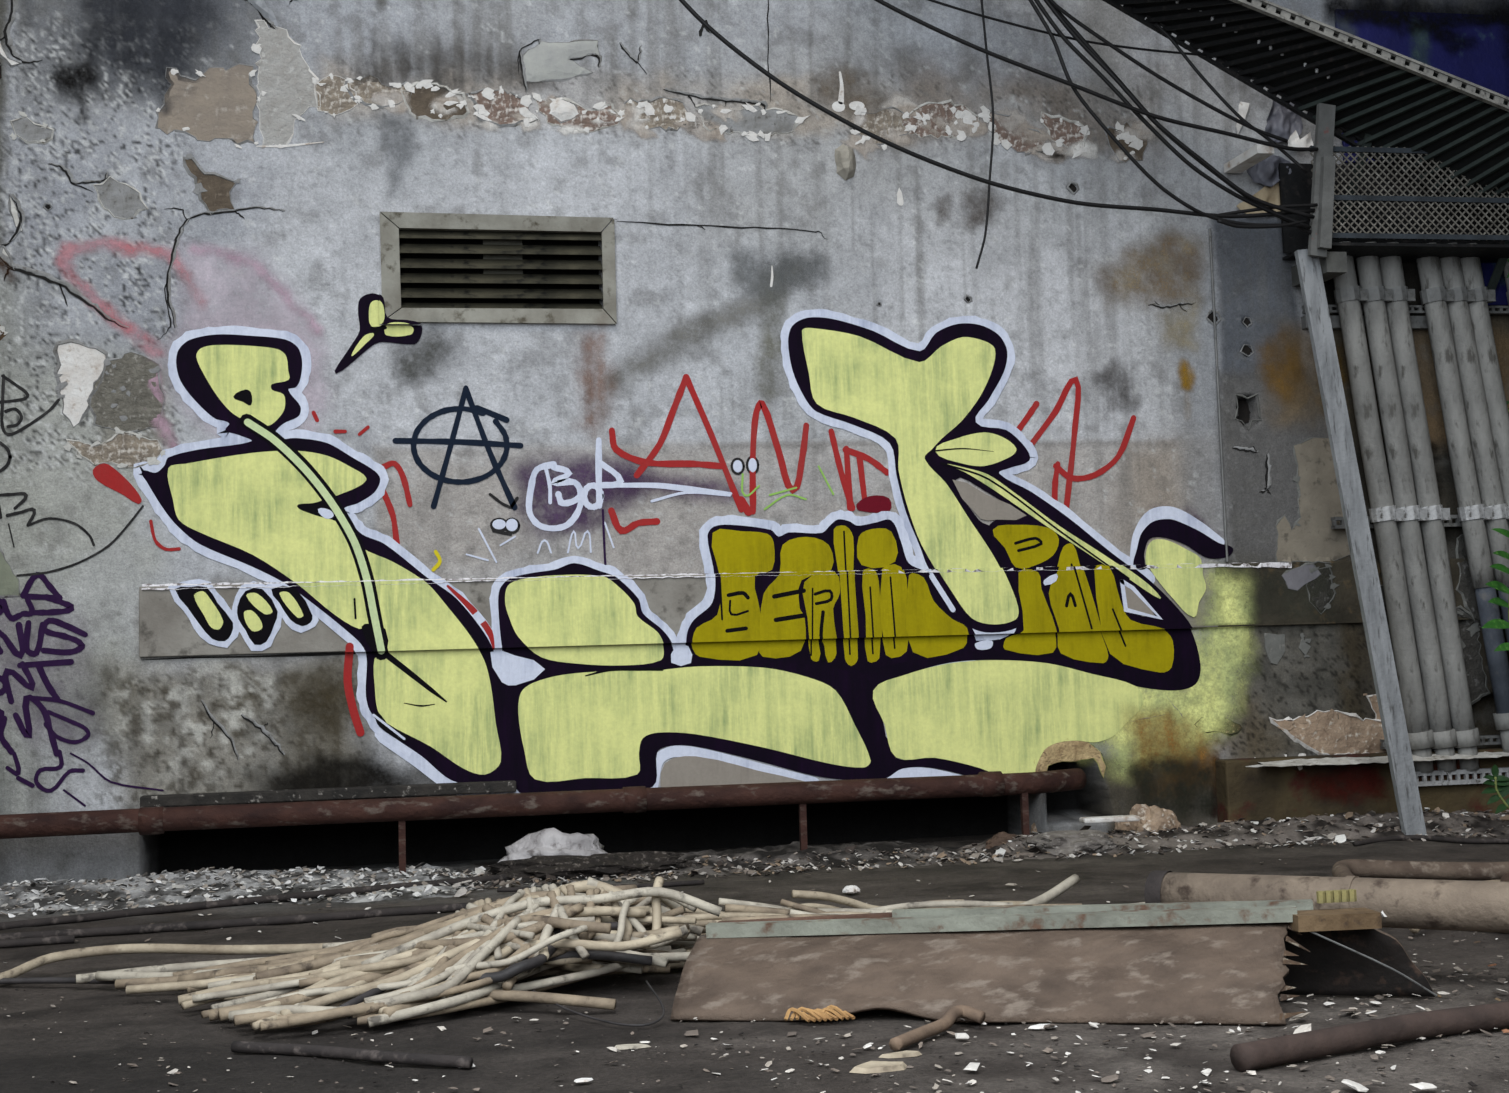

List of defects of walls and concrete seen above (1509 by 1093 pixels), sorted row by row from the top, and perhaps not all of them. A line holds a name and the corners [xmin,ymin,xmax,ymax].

crack [0,0,42,64]
crack [246,0,293,29]
spalling [155,20,810,216]
crack [49,163,109,192]
spalling [1066,181,1080,195]
crack [0,193,286,340]
peeling [1264,633,1311,665]
spalling [1380,585,1396,667]
spalling [1455,534,1491,705]
spalling [1034,738,1106,778]
spalling [1246,693,1389,770]
spalling [1412,749,1509,763]